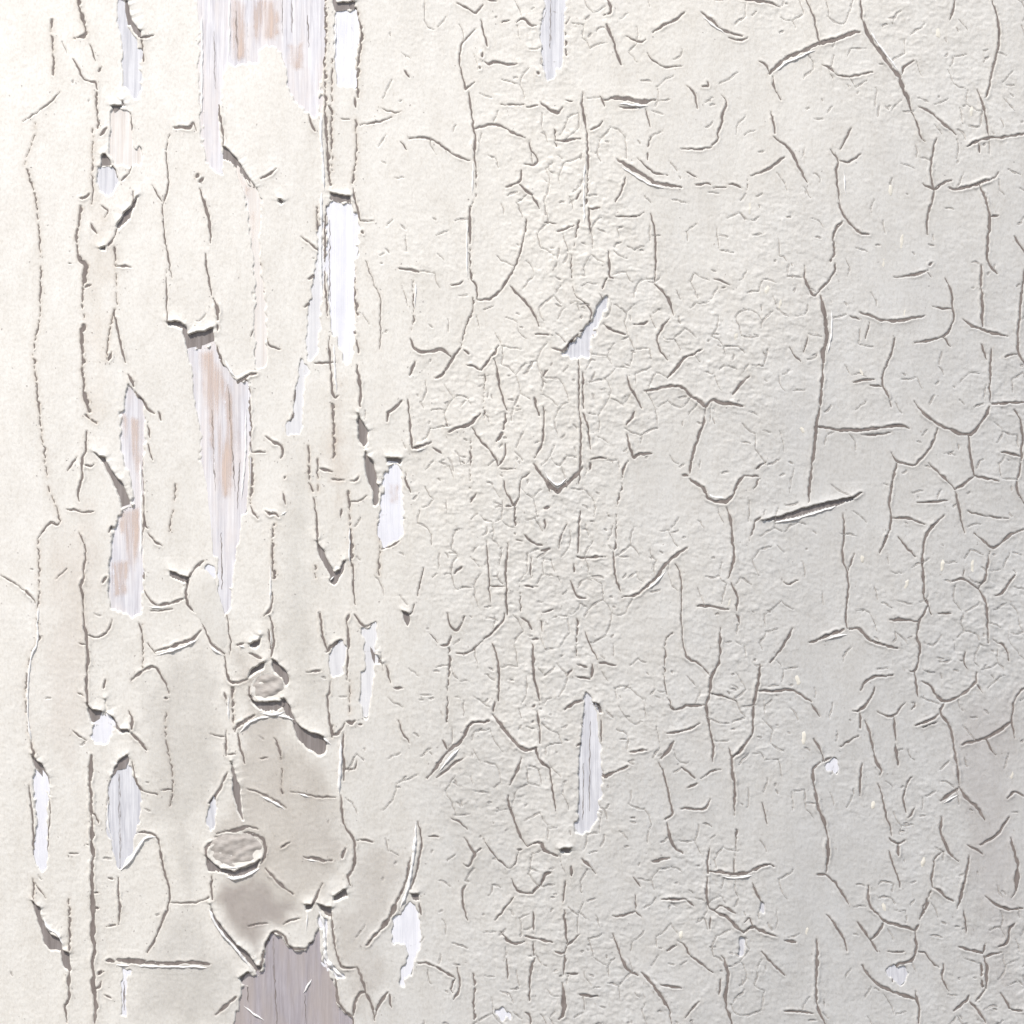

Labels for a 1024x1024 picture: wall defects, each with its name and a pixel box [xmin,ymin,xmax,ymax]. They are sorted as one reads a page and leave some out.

peeling [117,0,154,99]
peeling [174,0,359,188]
peeling [306,193,360,364]
peeling [97,341,251,618]
peeling [377,458,404,548]
crack [365,0,1024,1024]
peeling [329,640,348,677]
peeling [28,757,51,871]
peeling [106,755,142,869]
peeling [574,692,603,834]
peeling [234,912,353,1024]
peeling [392,902,422,987]